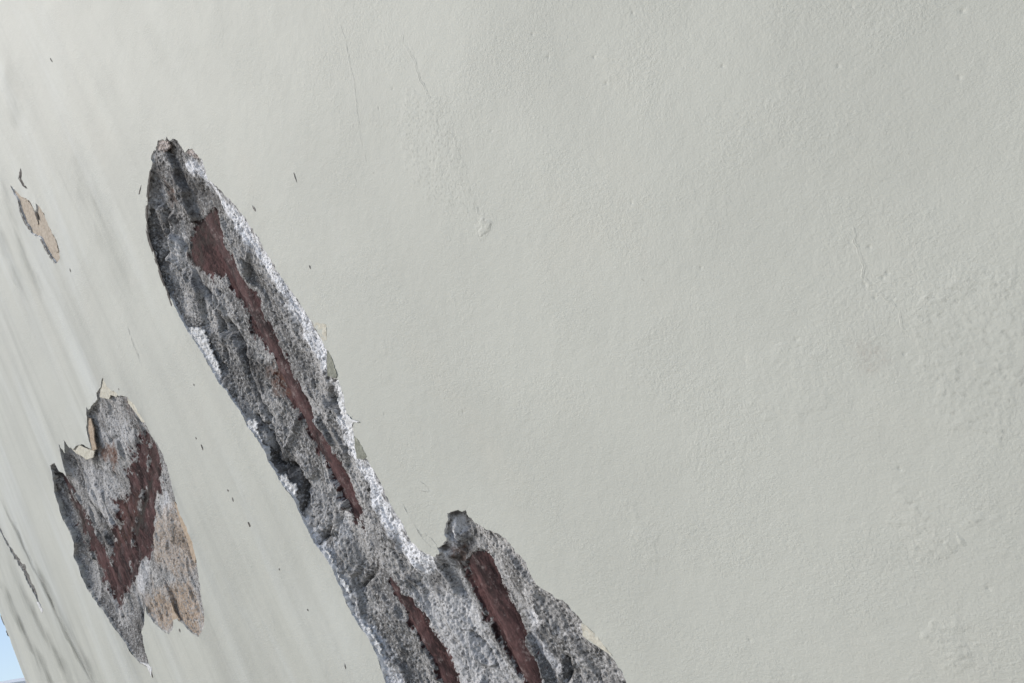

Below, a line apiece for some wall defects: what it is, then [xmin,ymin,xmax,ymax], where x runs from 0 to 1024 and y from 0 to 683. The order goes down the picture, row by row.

peeling [11,168,60,264]
spalling [50,378,205,678]
spalling [139,137,626,683]